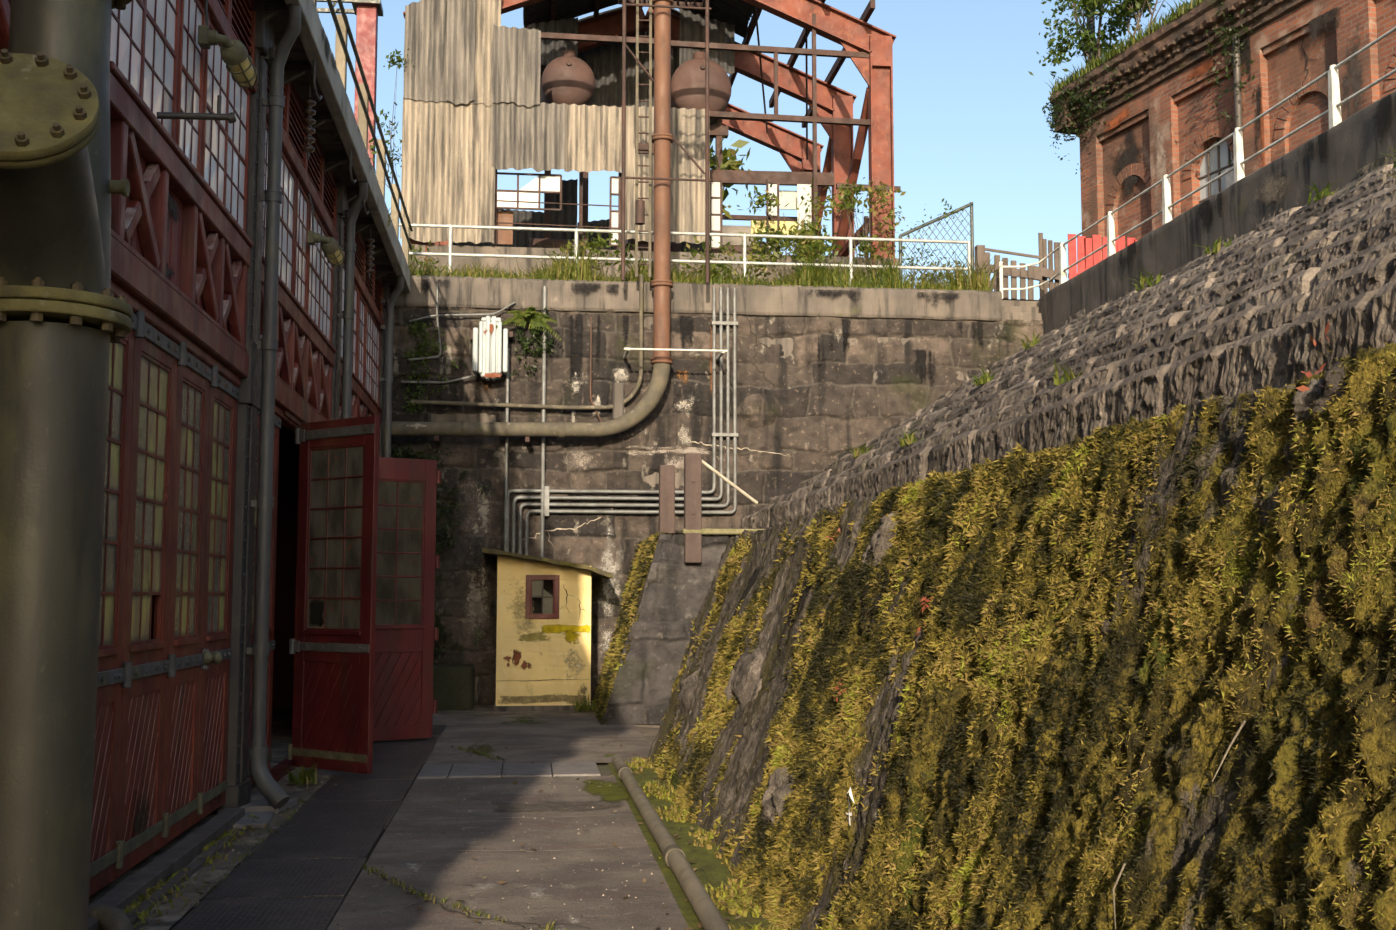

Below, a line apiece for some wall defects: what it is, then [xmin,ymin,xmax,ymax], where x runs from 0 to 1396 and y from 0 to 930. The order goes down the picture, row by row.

water stain [1343,29,1392,143]
water stain [1114,130,1143,199]
peeling [504,650,532,669]